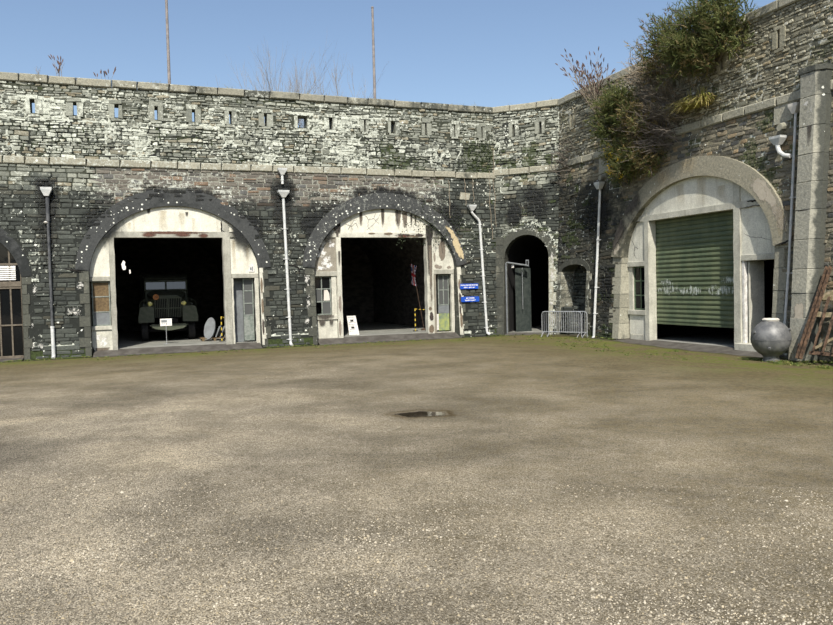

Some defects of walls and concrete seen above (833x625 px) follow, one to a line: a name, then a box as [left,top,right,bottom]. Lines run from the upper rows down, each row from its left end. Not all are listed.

peeling [317,239,340,271]